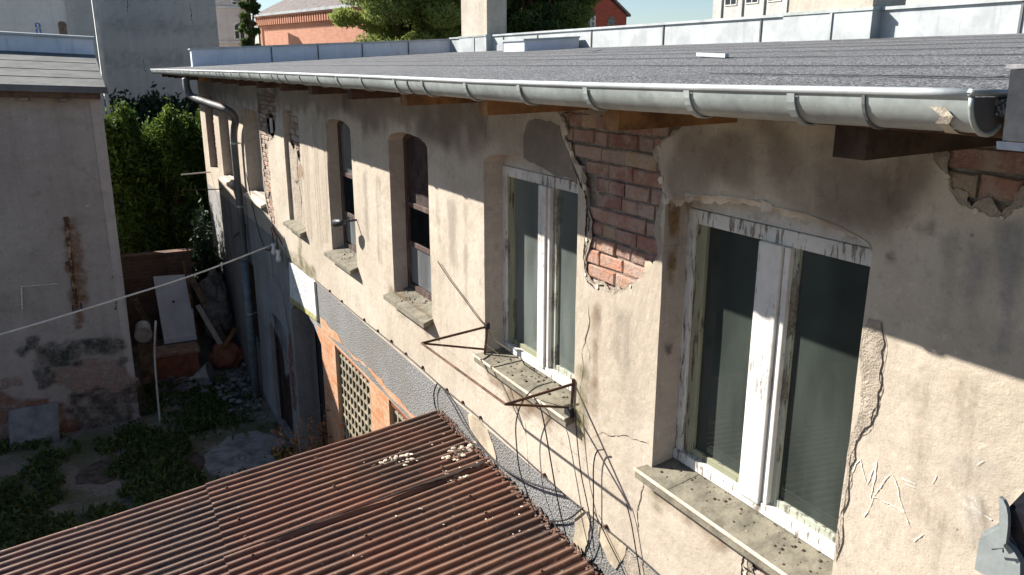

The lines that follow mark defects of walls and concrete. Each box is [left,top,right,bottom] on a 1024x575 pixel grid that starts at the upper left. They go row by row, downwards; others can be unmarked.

rust [63,217,86,328]
flaking render [257,88,277,237]
crack [574,168,595,400]
flaking render [558,108,872,295]
flaking render [928,141,1024,221]
leakage [18,338,126,389]
flaking render [834,319,885,561]